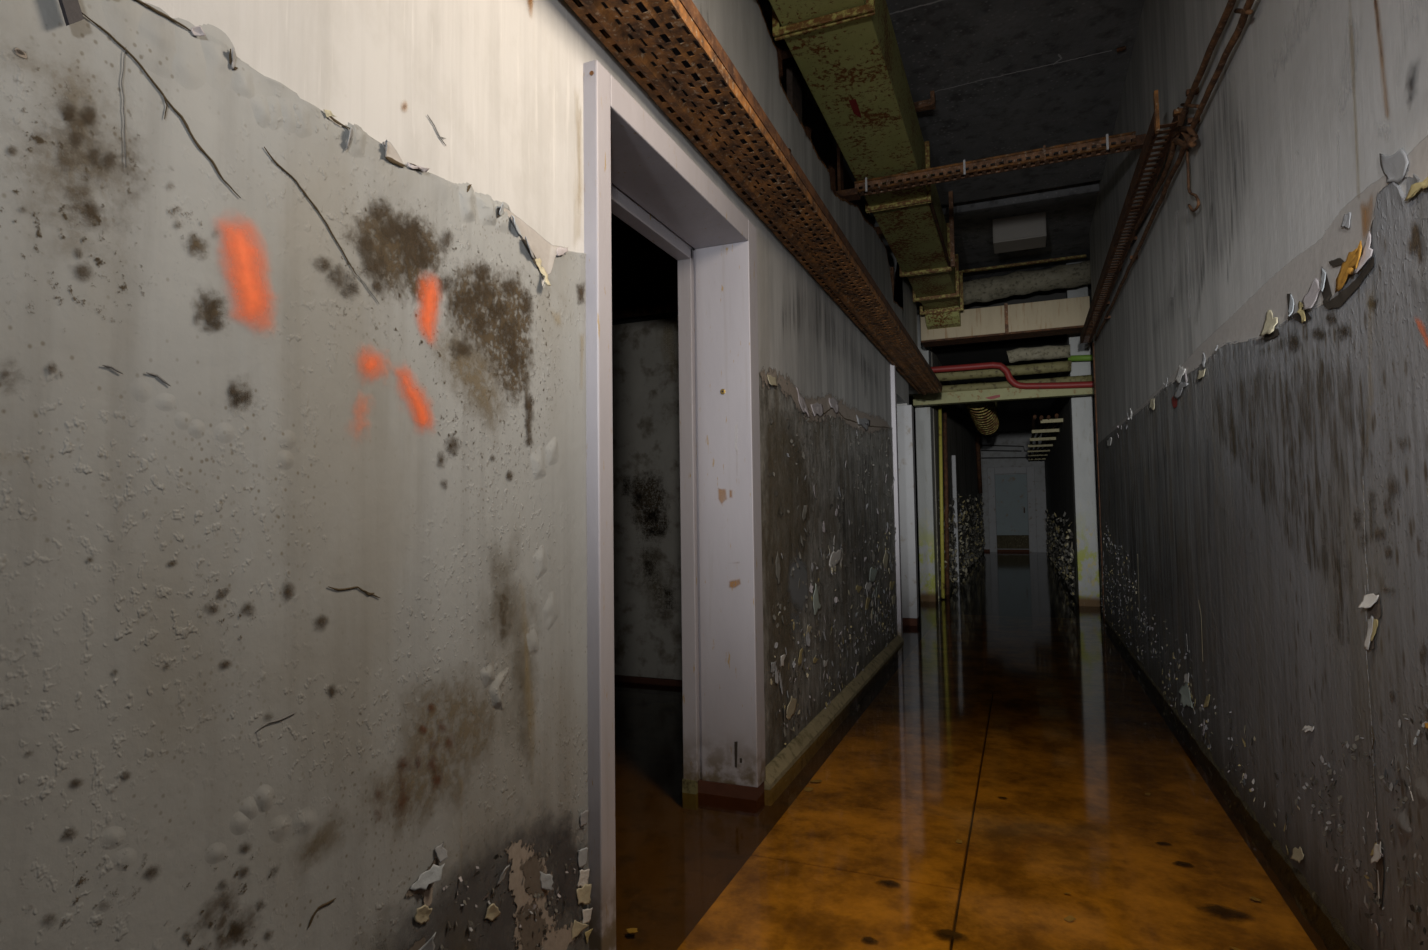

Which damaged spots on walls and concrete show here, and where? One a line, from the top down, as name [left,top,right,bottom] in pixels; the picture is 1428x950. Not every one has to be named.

damp [0,75,129,312]
crack [82,13,241,198]
damp [319,199,560,478]
peeling [1106,136,1428,446]
damp [623,473,673,608]
peeling [760,366,896,748]
peeling [1101,523,1428,949]
spalling [405,839,593,950]